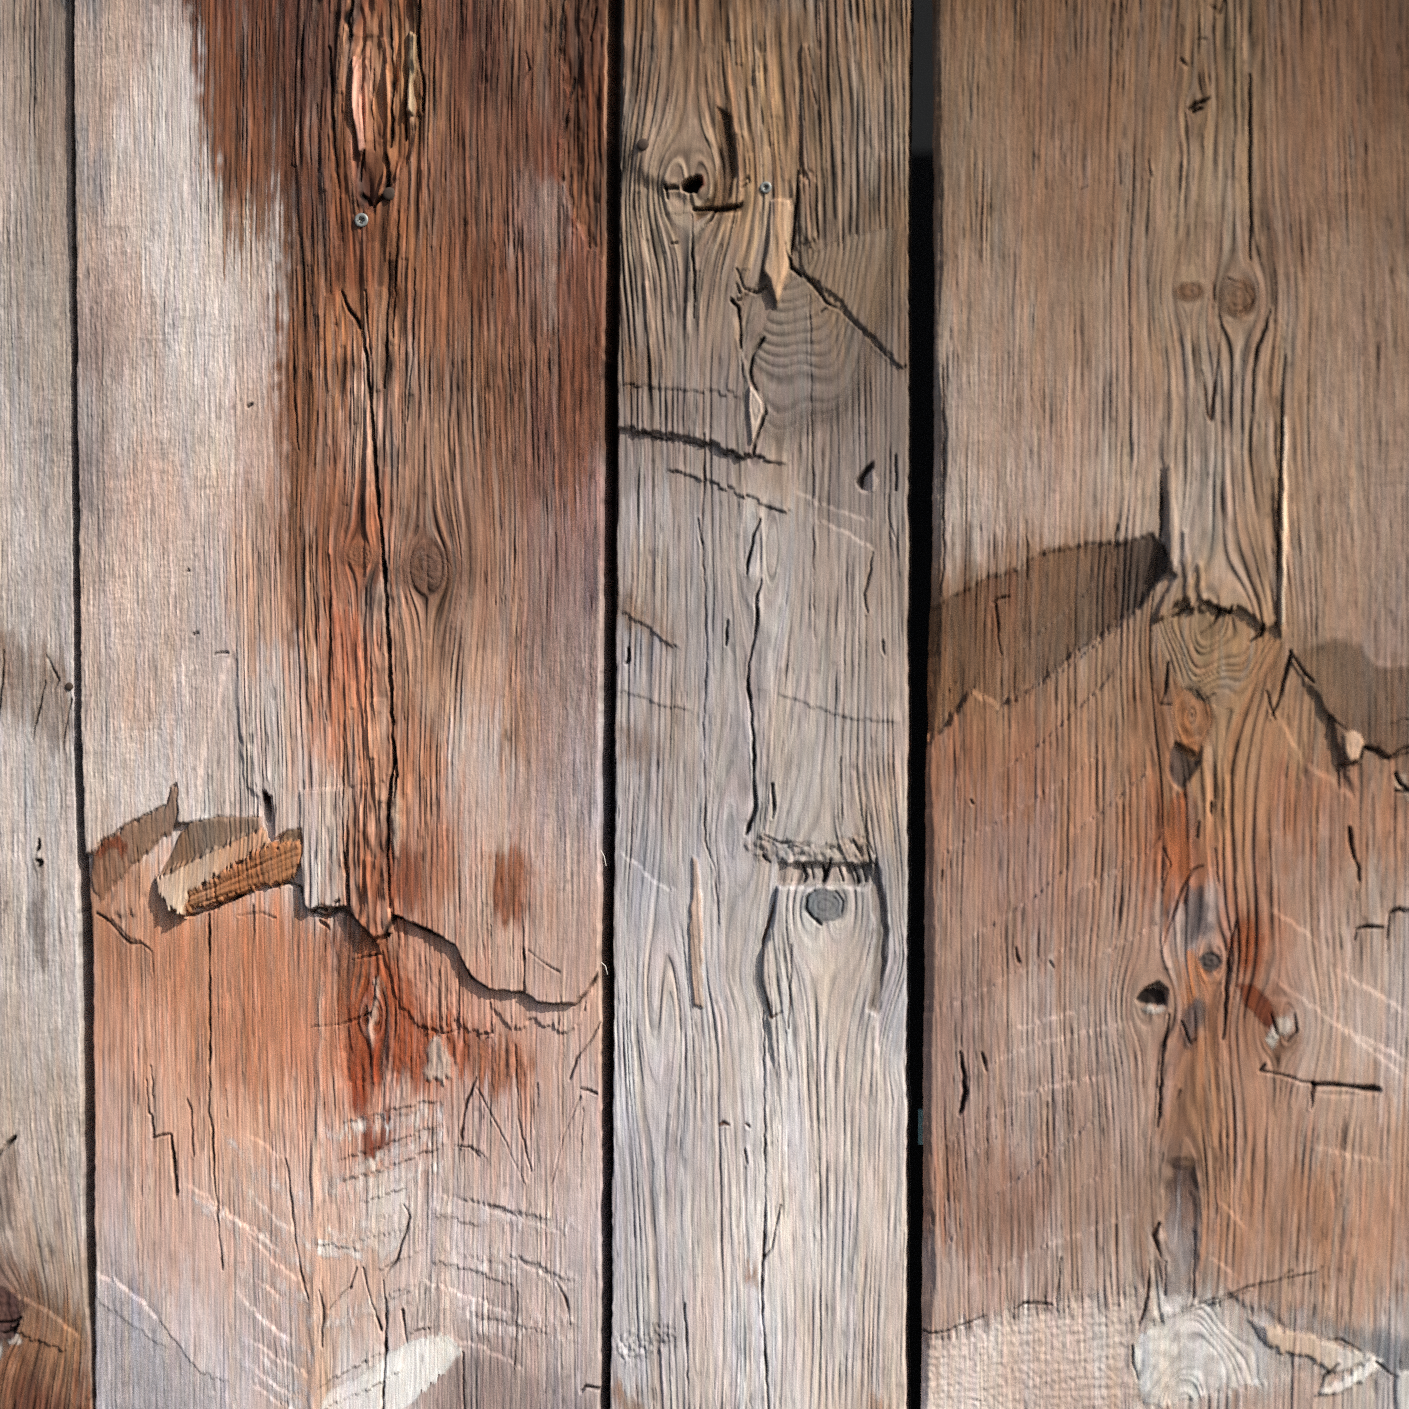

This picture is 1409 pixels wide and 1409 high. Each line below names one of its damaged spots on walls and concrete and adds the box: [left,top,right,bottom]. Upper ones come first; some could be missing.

crack [664,184,742,310]
crack [787,252,833,307]
crack [642,300,810,862]
crack [364,342,489,989]
peeling [1344,731,1365,762]
crack [1352,746,1409,792]
spalling [91,785,347,917]
spalling [744,833,887,1013]
peeling [1266,1017,1293,1048]
crack [460,1082,475,1148]
spalling [921,1285,1382,1409]
spalling [1396,1371,1409,1409]